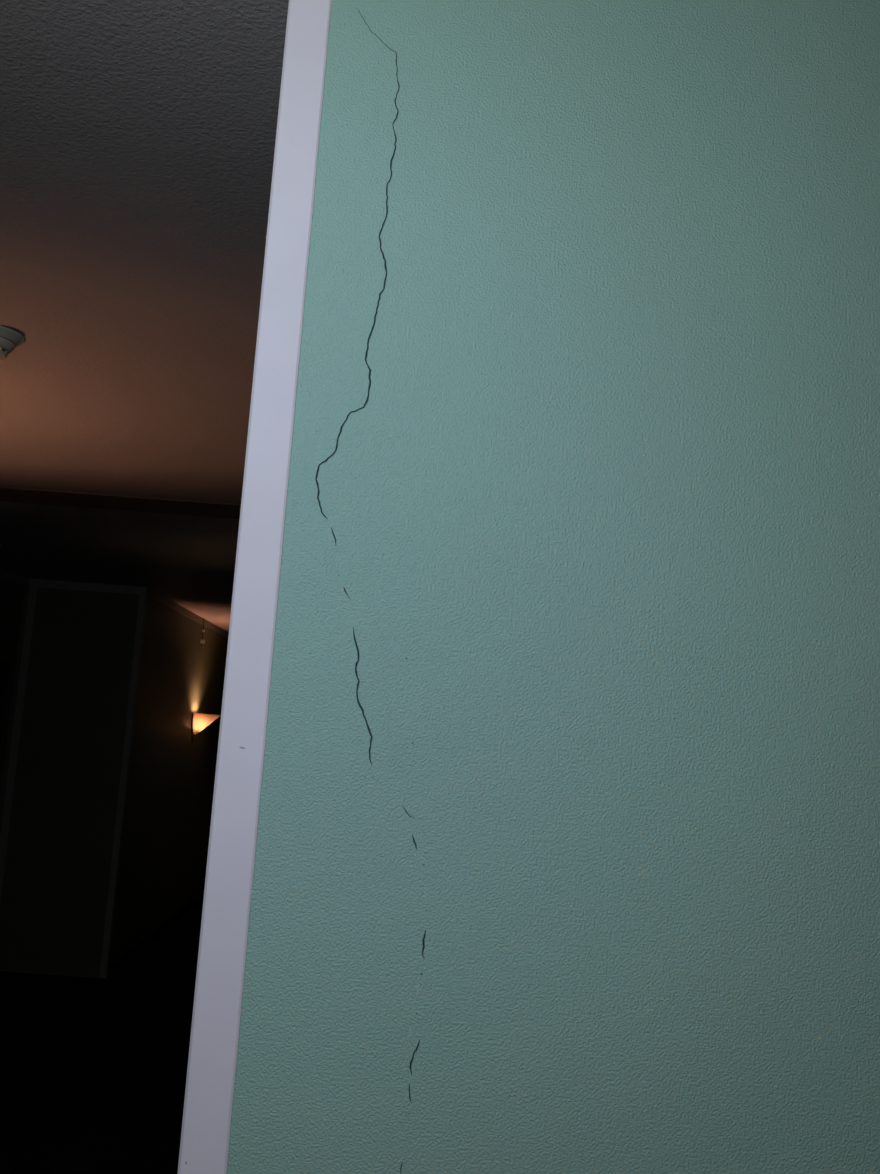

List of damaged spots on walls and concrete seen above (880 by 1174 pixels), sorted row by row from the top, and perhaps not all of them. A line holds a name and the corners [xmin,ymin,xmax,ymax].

crack [315,10,400,545]
crack [353,628,373,765]
crack [406,1013,420,1117]